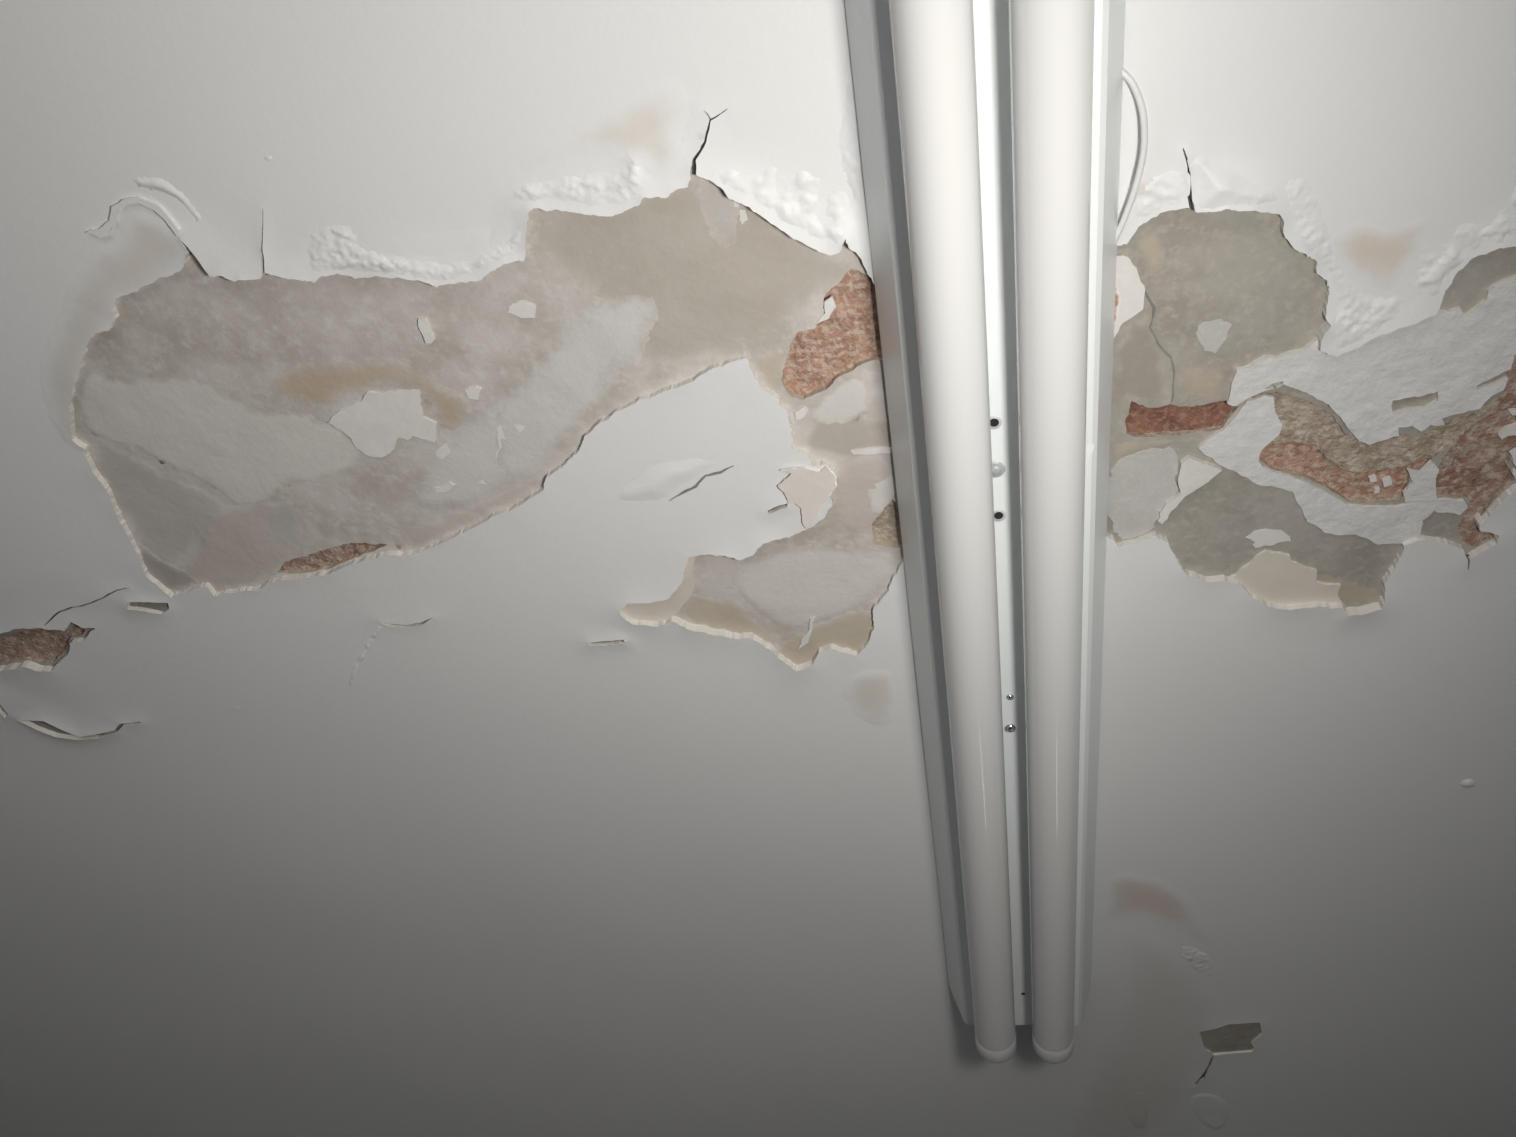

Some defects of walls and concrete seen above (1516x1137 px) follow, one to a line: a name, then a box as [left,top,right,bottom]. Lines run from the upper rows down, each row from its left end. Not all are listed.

spalling [73,174,904,665]
spalling [1107,207,1516,607]
spalling [0,622,93,666]
spalling [30,721,73,735]
spalling [1200,1023,1262,1053]